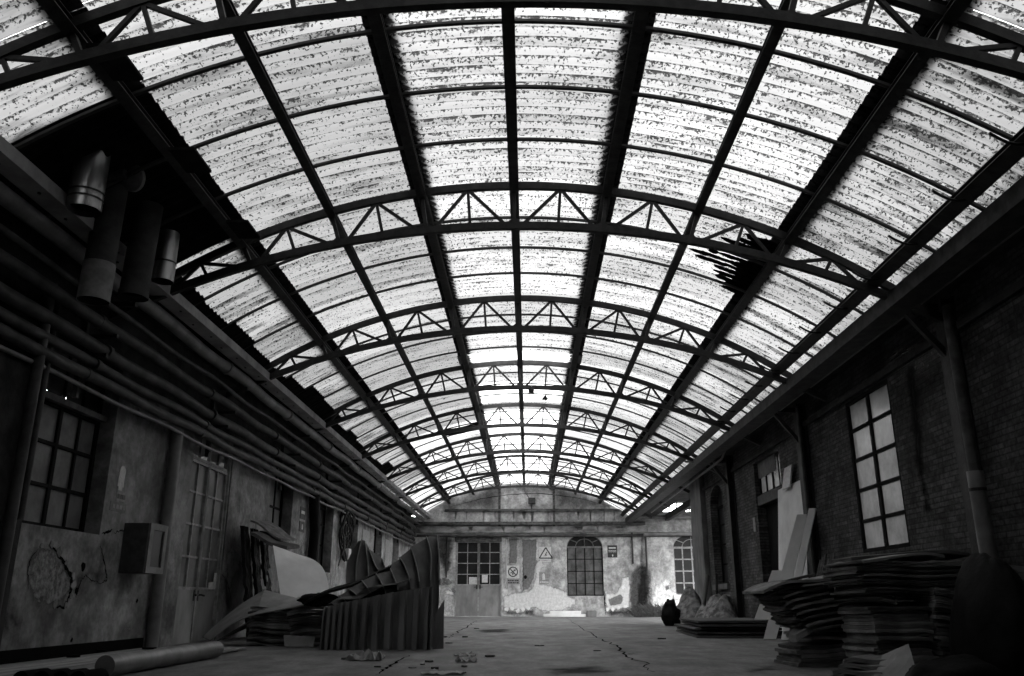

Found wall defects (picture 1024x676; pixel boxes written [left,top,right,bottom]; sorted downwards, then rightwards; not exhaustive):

spalling [27,540,107,609]
peeling [504,561,575,615]
peeling [606,577,630,615]
crack [571,591,654,672]